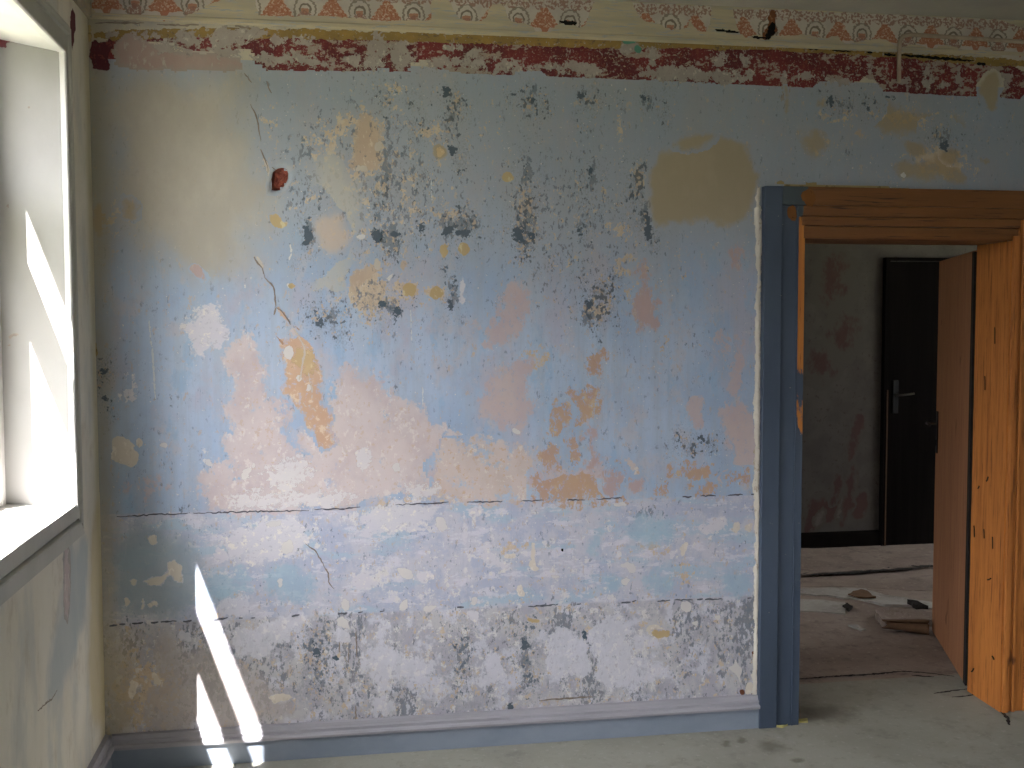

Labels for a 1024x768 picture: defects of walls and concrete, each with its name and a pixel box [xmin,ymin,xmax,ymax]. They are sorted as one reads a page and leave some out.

peeling [132,25,606,78]
peeling [619,42,755,86]
peeling [900,62,964,93]
flaking render [343,105,391,179]
spalling [265,160,295,196]
crack [254,256,291,325]
crack [117,507,358,517]
peeling [102,263,566,732]
crack [396,499,446,507]
crack [109,617,255,627]
crack [305,543,384,663]
crack [621,596,752,604]